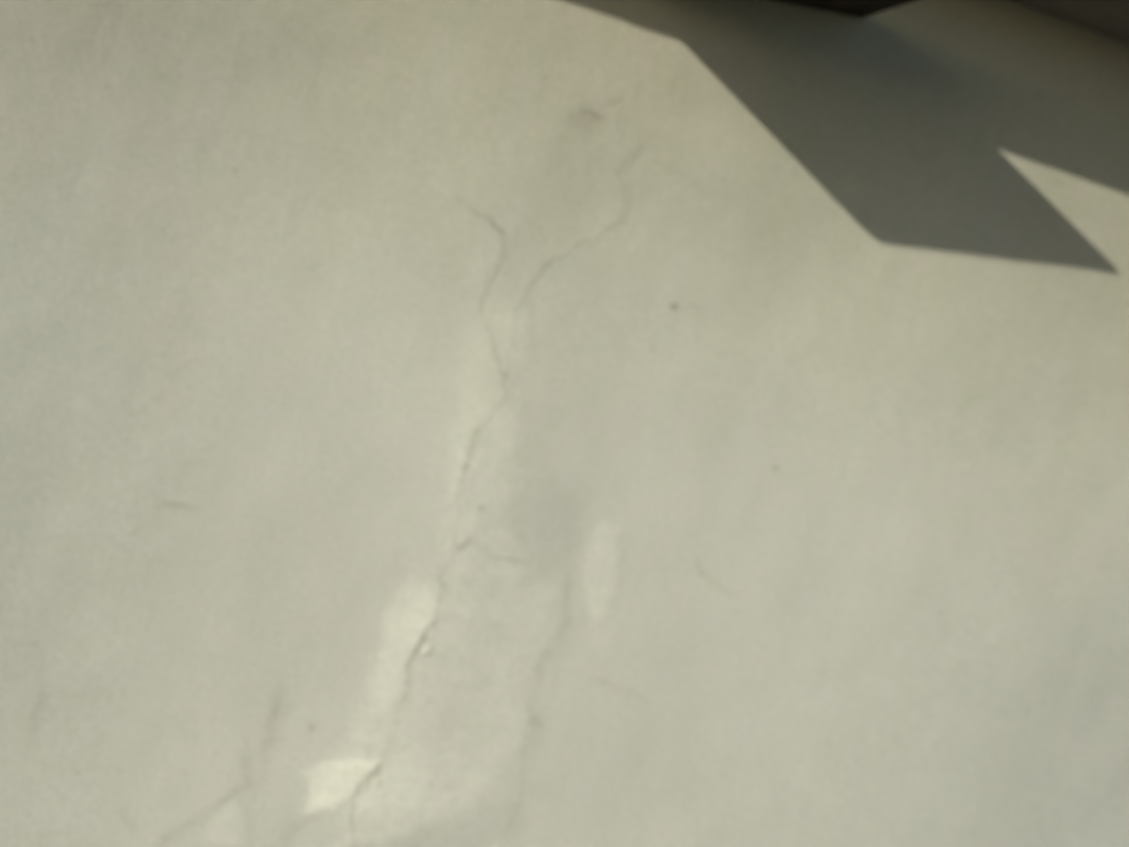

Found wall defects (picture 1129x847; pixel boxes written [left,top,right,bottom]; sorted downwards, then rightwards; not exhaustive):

peeling [300,756,380,815]
crack [347,127,652,847]